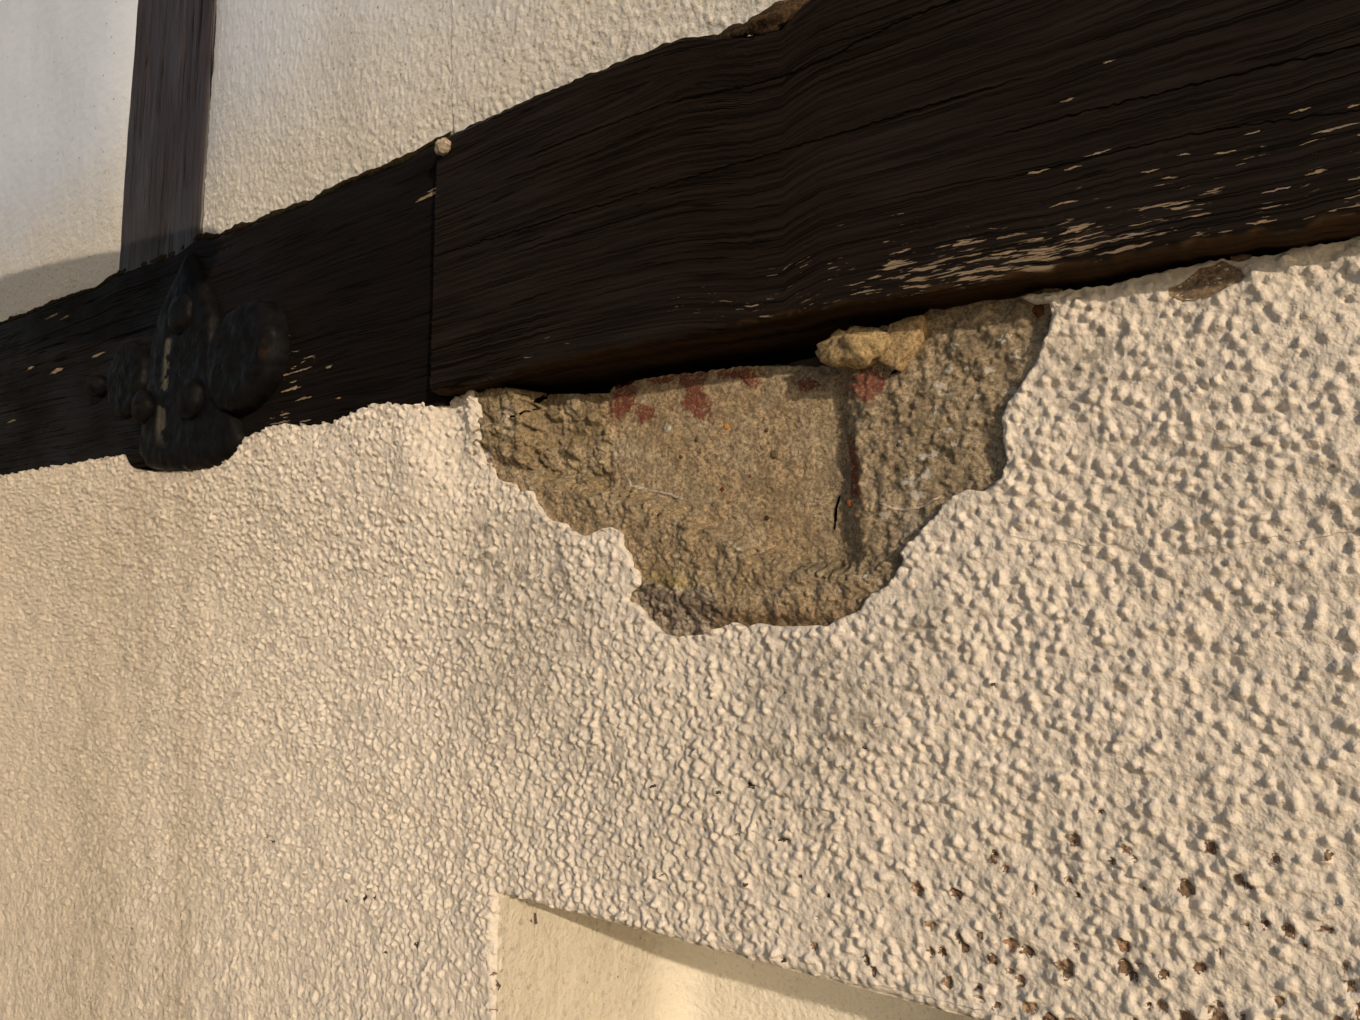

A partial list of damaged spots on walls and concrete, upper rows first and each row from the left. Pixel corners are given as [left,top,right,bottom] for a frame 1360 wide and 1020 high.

flaking render [469,288,1062,637]
crack [997,525,1360,557]